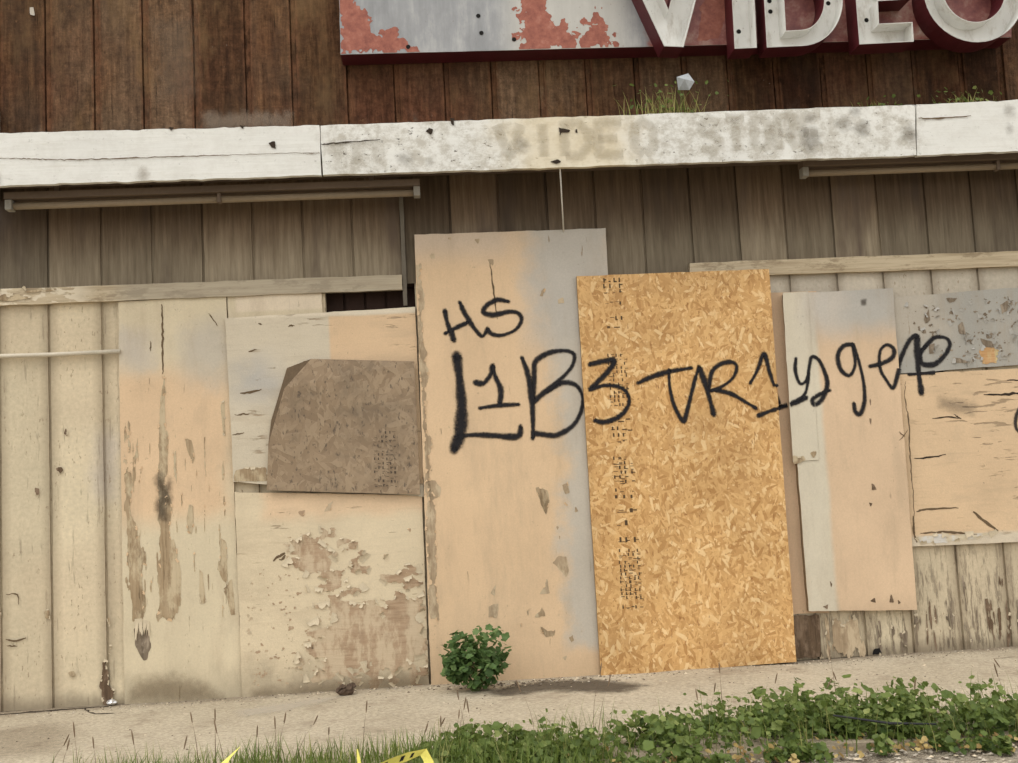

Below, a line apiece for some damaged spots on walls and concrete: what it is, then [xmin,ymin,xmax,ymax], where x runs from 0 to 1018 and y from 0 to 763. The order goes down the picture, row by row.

peeling [340,0,420,54]
peeling [511,0,619,49]
peeling [904,291,1018,367]
water stain [158,480,168,516]
peeling [123,376,235,661]
peeling [222,464,267,482]
peeling [246,254,441,689]
peeling [915,529,999,545]
peeling [793,605,866,660]
peeling [877,576,1018,655]